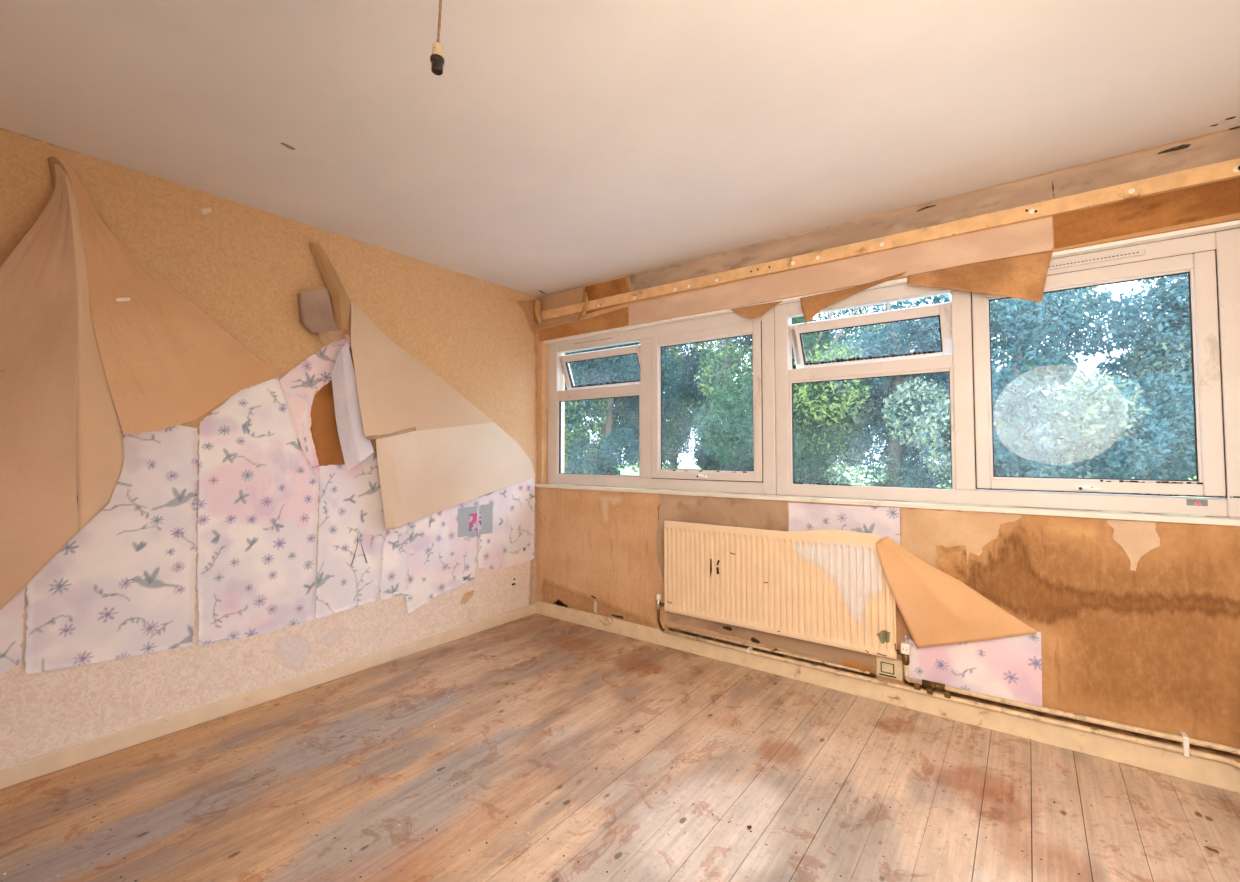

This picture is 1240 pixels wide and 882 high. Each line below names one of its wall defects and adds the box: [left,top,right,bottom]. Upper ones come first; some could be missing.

peeling [309,242,350,331]
flaking render [310,380,345,466]
peeling [876,536,1038,648]
damp [961,513,1240,763]